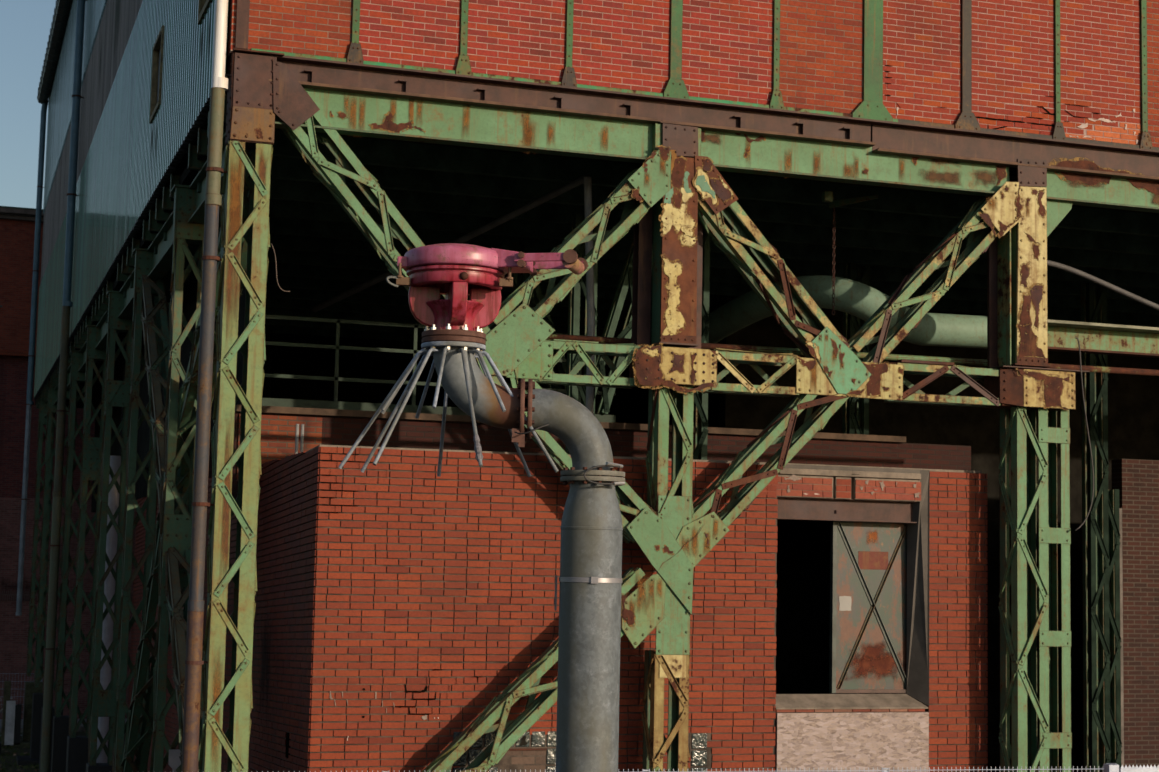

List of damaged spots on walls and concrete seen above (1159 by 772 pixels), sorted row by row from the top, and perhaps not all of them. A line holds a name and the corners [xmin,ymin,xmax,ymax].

rust [330,97,426,133]
rust [524,113,554,145]
rust [701,131,720,144]
rust [735,133,766,158]
crack [976,96,1112,129]
rust [1048,157,1159,204]
peeling [632,150,735,395]
rust [796,335,904,399]
rust [621,521,718,627]
rust [851,643,904,678]